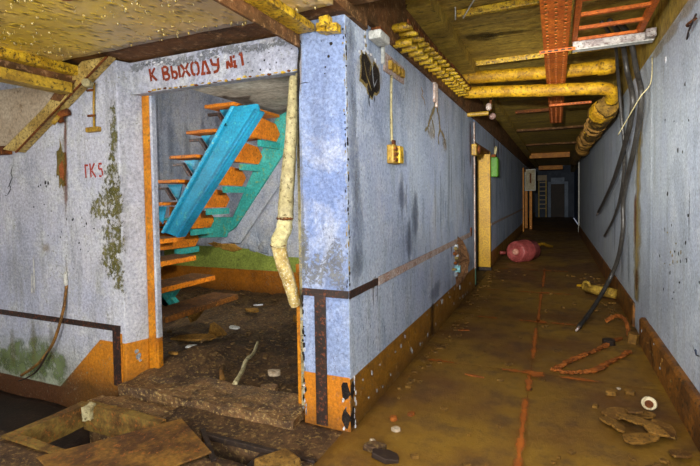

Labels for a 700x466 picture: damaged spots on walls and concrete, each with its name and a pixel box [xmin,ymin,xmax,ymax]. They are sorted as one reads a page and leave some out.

water stain [89,101,126,293]
water stain [0,339,66,382]